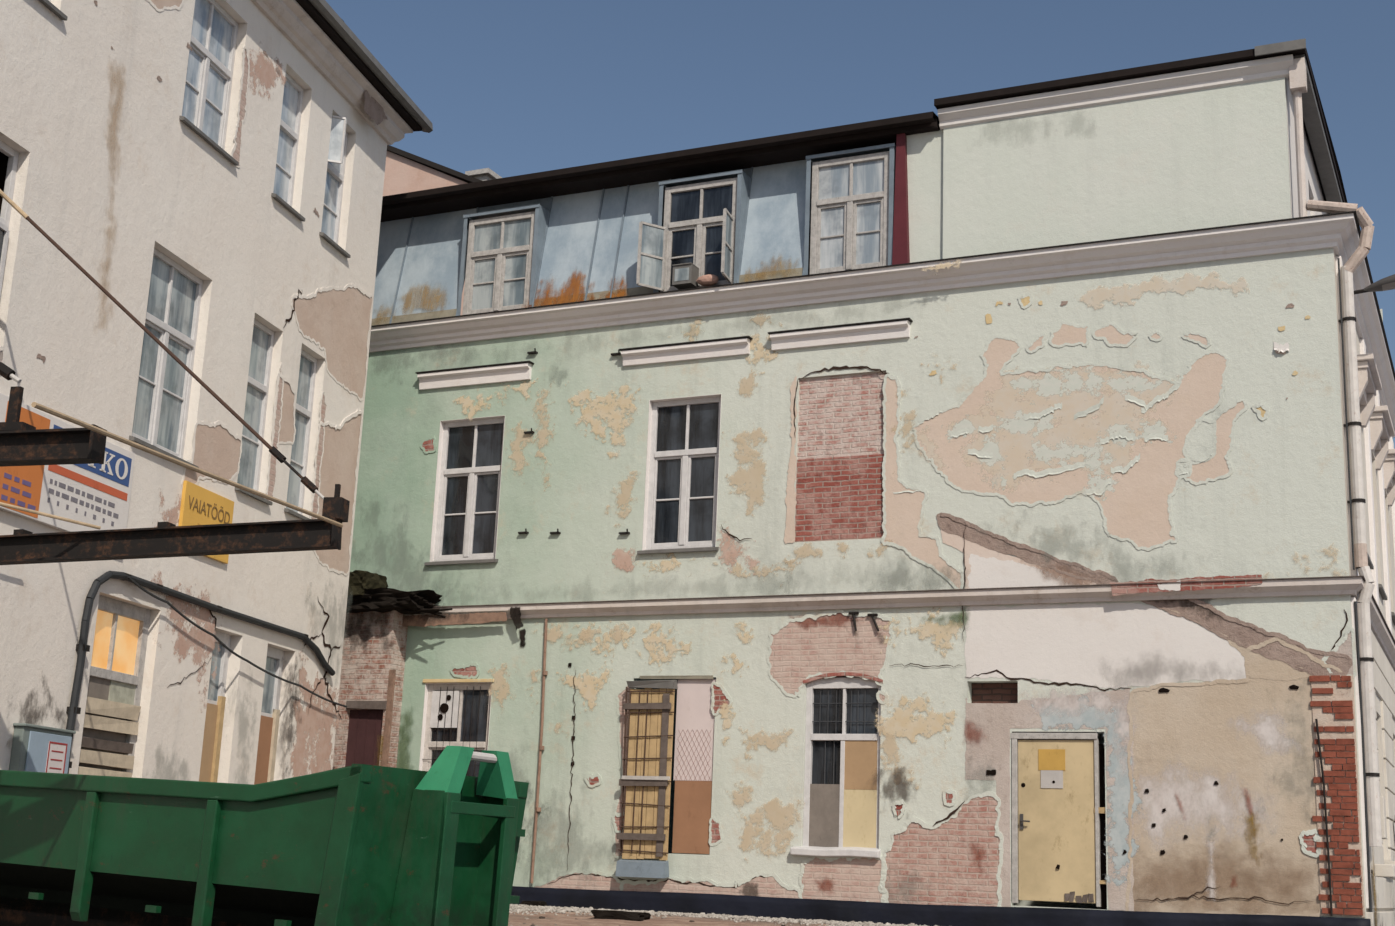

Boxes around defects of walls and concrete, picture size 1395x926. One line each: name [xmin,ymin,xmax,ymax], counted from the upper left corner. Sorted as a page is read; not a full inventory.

crack [283,289,302,328]
rust [530,272,626,307]
peeling [266,362,296,503]
peeling [291,284,373,576]
peeling [703,376,848,577]
peeling [867,271,1269,589]
peeling [151,573,217,707]
crack [304,600,342,720]
peeling [612,548,681,572]
crack [891,525,1129,691]
crack [549,663,797,892]
flaking render [532,599,1357,917]